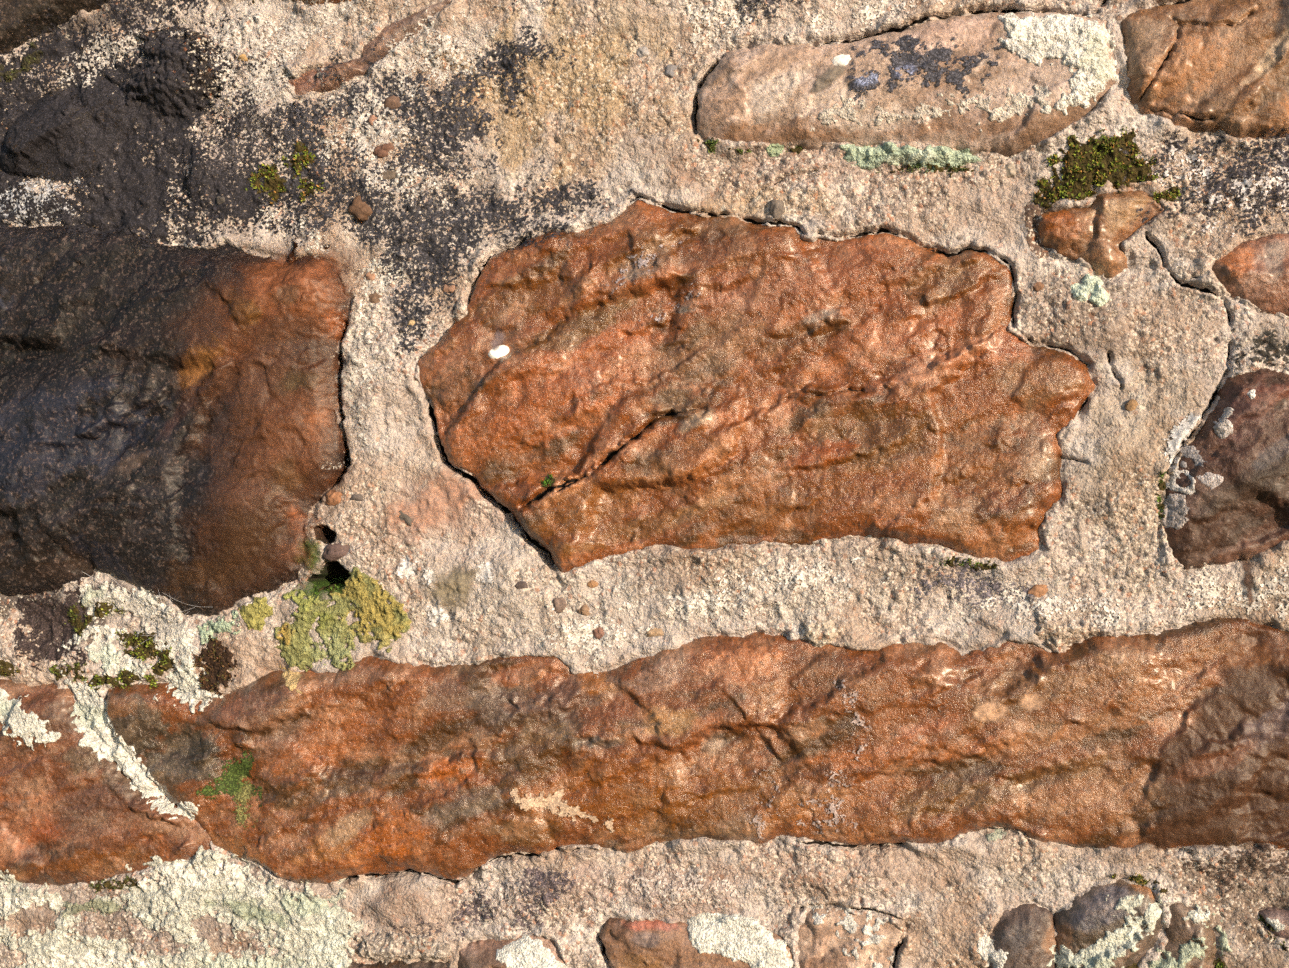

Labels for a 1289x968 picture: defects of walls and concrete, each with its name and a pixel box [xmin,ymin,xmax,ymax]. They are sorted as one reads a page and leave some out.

crack [428,399,698,564]